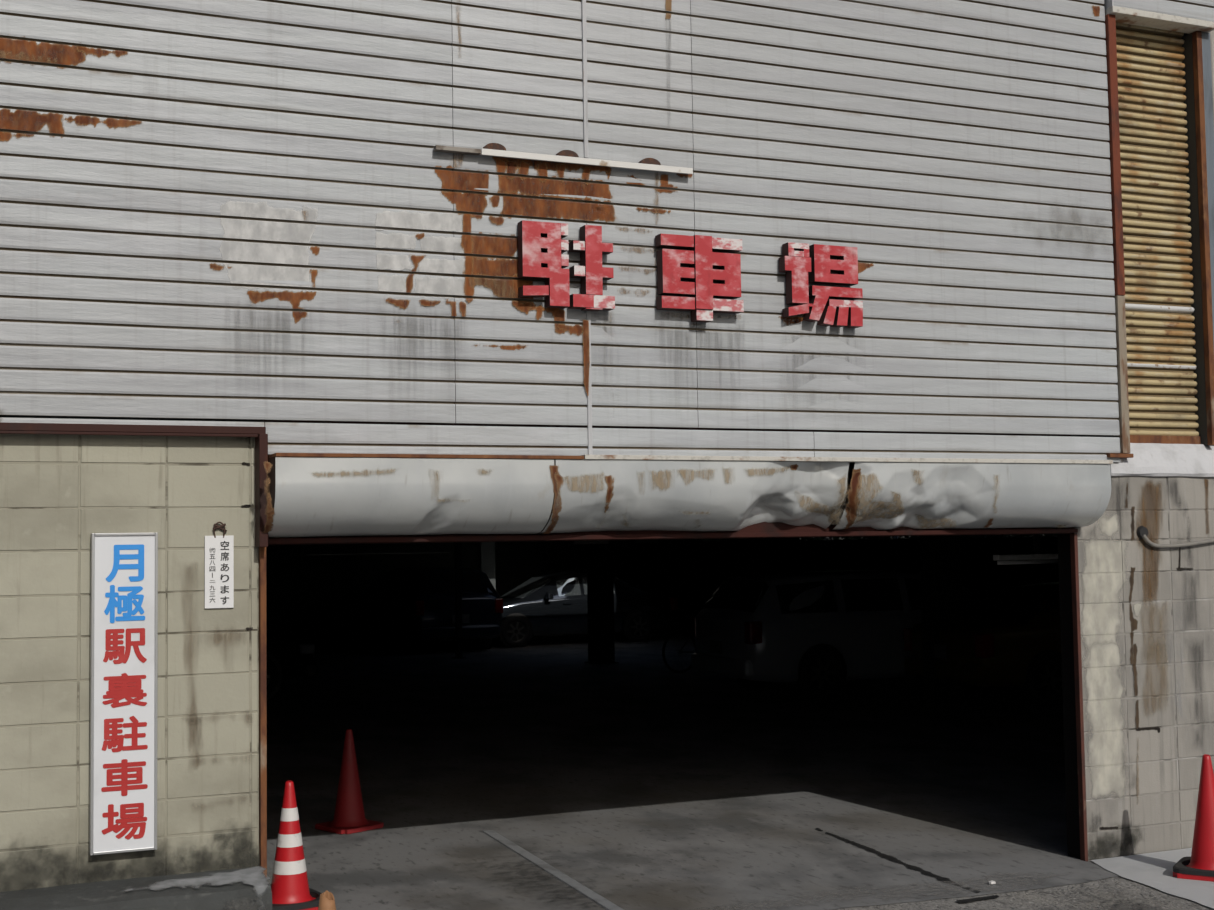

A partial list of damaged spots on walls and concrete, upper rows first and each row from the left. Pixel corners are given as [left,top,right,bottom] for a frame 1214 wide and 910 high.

rust [0,36,128,69]
rust [0,108,142,141]
rust [435,154,692,396]
rust [543,465,563,534]
rust [605,475,614,513]
leakage [1137,481,1181,711]